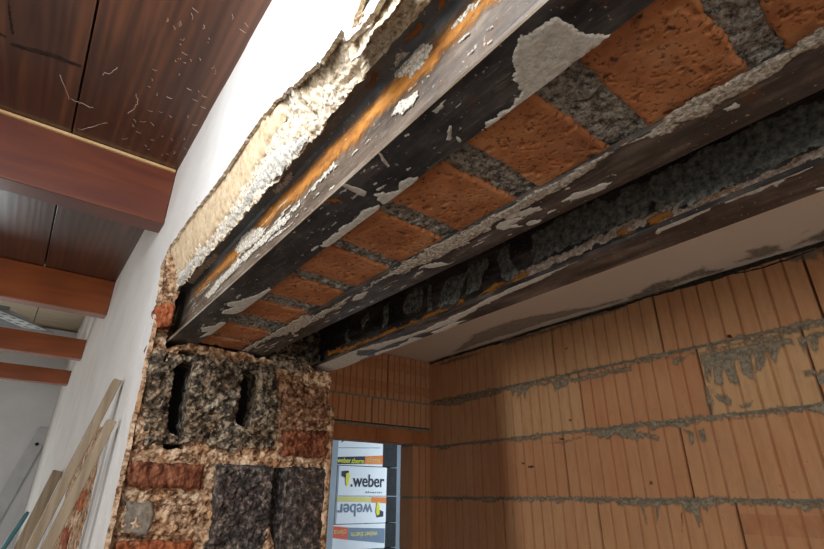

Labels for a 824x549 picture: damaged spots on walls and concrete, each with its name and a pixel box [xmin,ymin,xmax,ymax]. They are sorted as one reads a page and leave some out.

crack [0,1,81,68]
flaking render [170,0,431,292]
rust [254,0,495,230]
rust [195,245,239,295]
damp [433,319,824,444]